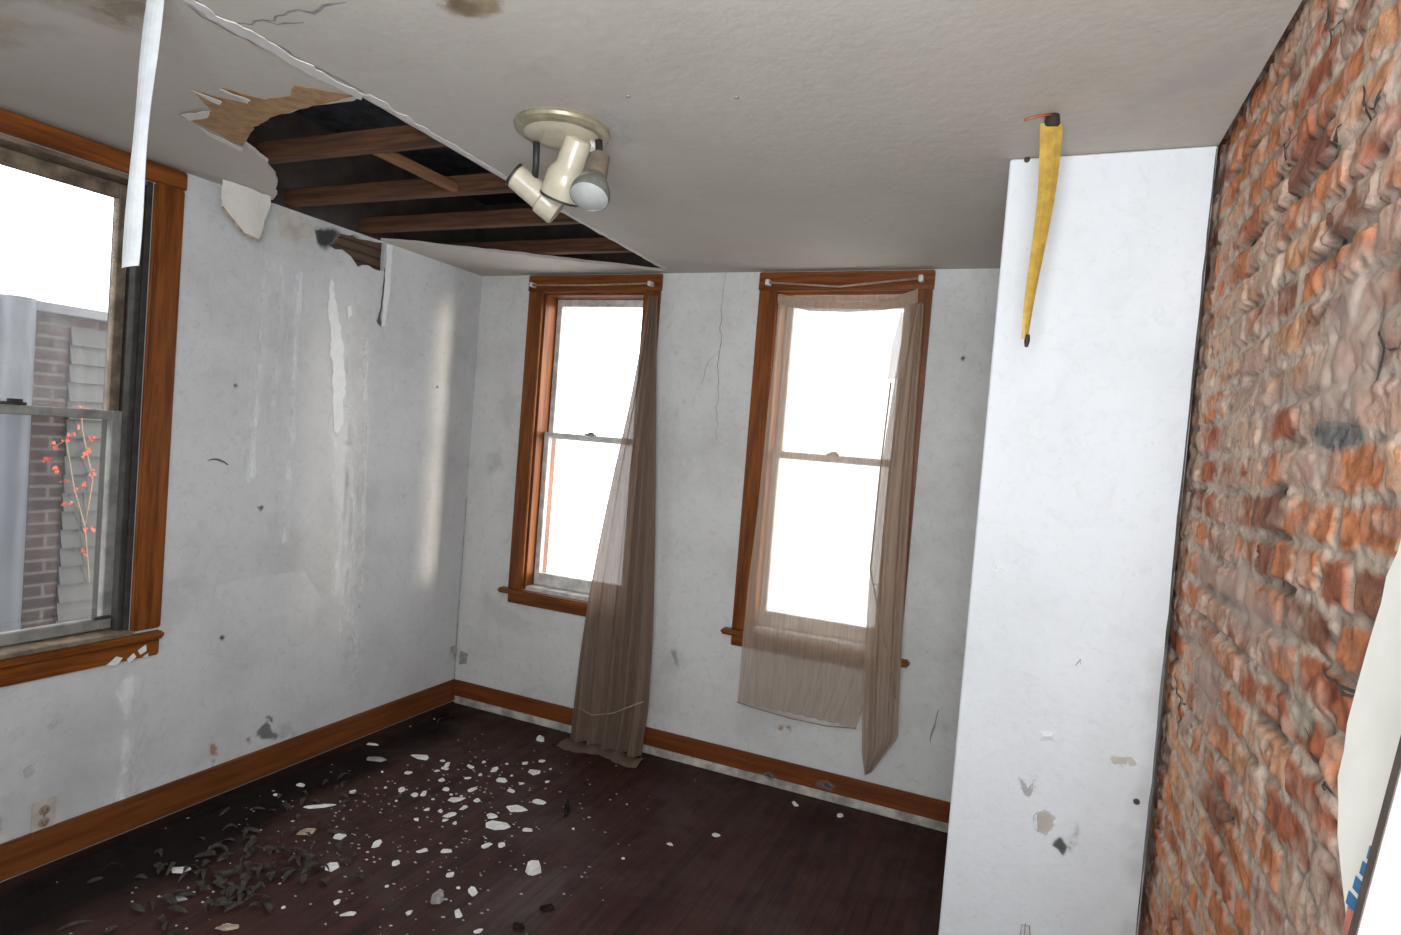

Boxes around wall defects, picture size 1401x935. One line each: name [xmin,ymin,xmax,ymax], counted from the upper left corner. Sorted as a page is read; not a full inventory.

water stain [49,0,146,25]
water stain [445,0,500,17]
peeling [181,89,250,151]
spalling [364,94,508,180]
peeling [214,179,271,242]
spalling [560,209,667,269]
peeling [107,645,148,666]
peeling [1034,811,1055,834]